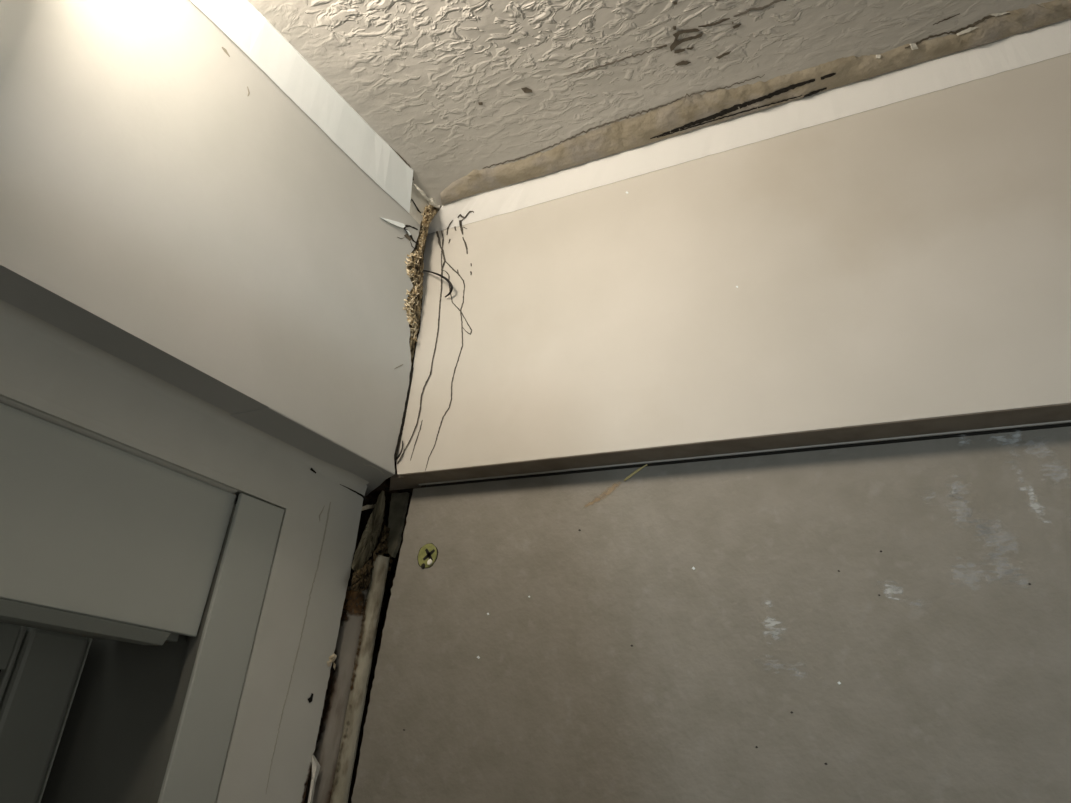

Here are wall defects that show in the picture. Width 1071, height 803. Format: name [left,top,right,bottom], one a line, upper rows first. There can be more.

crack [564,48,661,77]
peeling [656,18,741,66]
peeling [905,12,1010,50]
crack [483,73,836,169]
crack [389,145,474,470]
spalling [350,525,393,592]